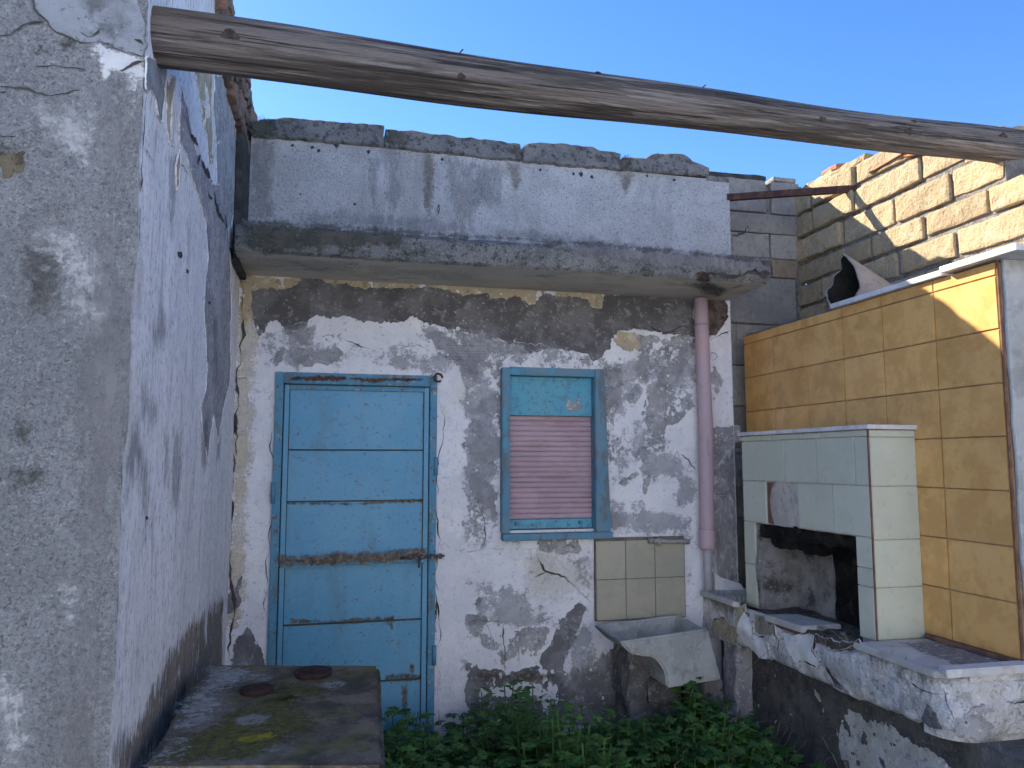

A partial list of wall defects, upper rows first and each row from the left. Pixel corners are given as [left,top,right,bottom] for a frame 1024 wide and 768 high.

crack [0,0,143,96]
flaking render [32,0,695,530]
flaking render [708,300,730,337]
rust [291,375,421,383]
crack [227,280,247,660]
peeling [713,425,742,527]
rust [277,548,427,568]
crack [529,548,587,598]
leakage [120,599,345,768]
flaking render [464,596,616,752]
flaking render [710,604,862,668]
peeling [836,708,953,768]